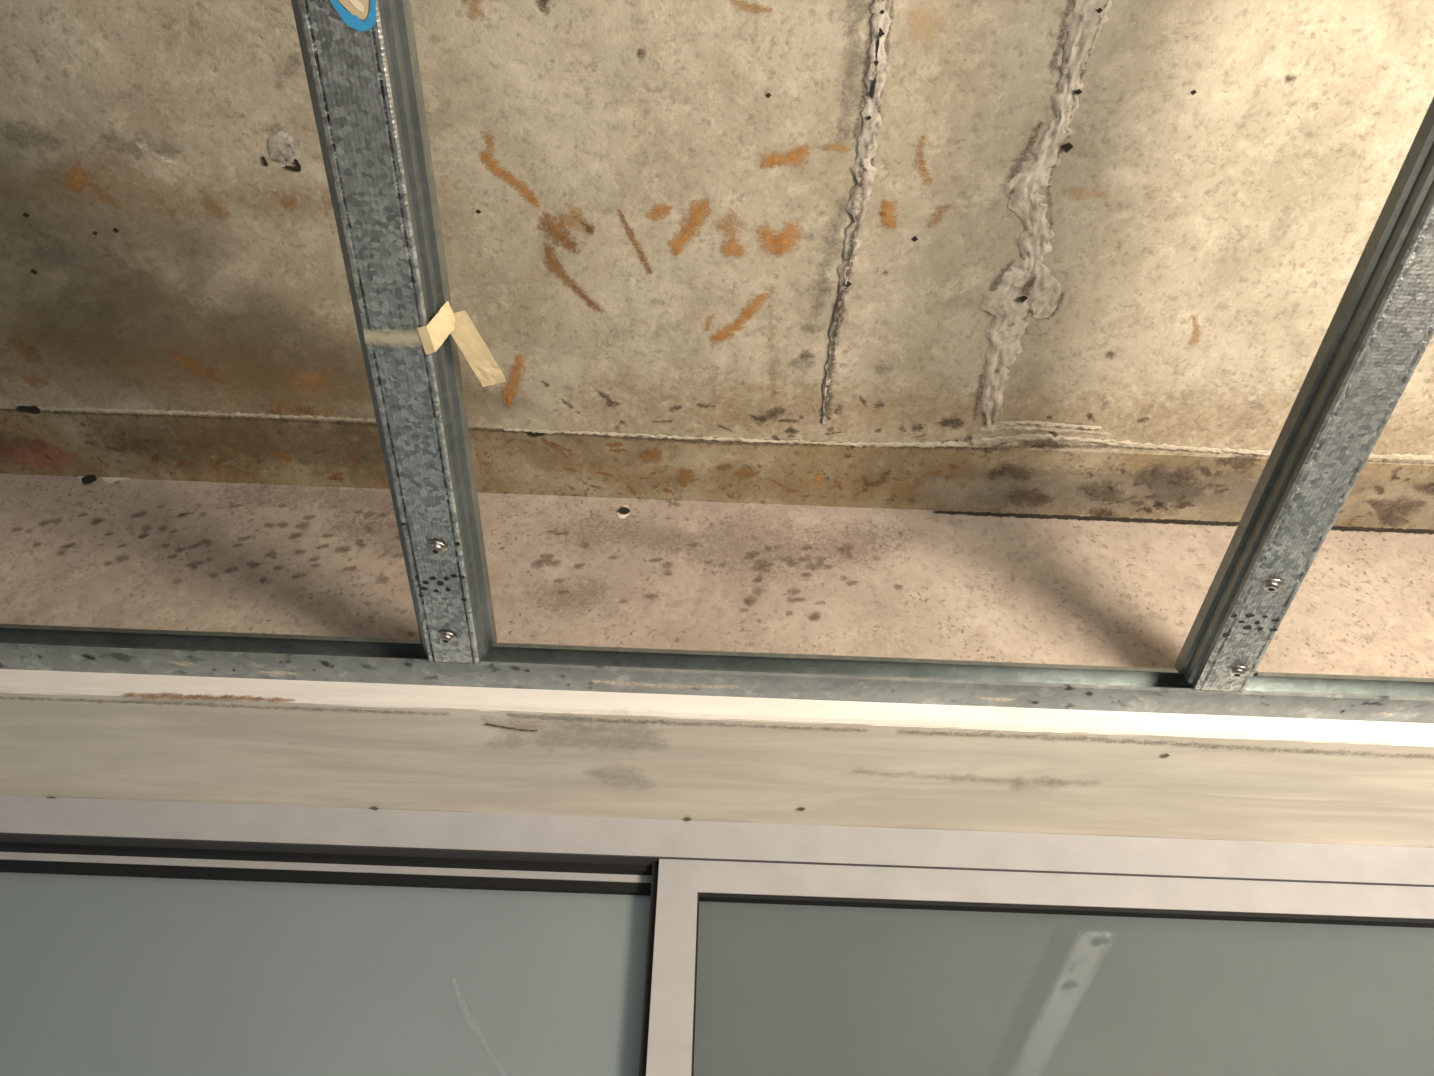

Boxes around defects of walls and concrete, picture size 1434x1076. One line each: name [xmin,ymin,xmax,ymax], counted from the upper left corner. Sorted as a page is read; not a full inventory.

water stain [599,392,627,452]
water stain [751,408,802,444]
water stain [919,454,1260,518]
water stain [1338,470,1434,525]